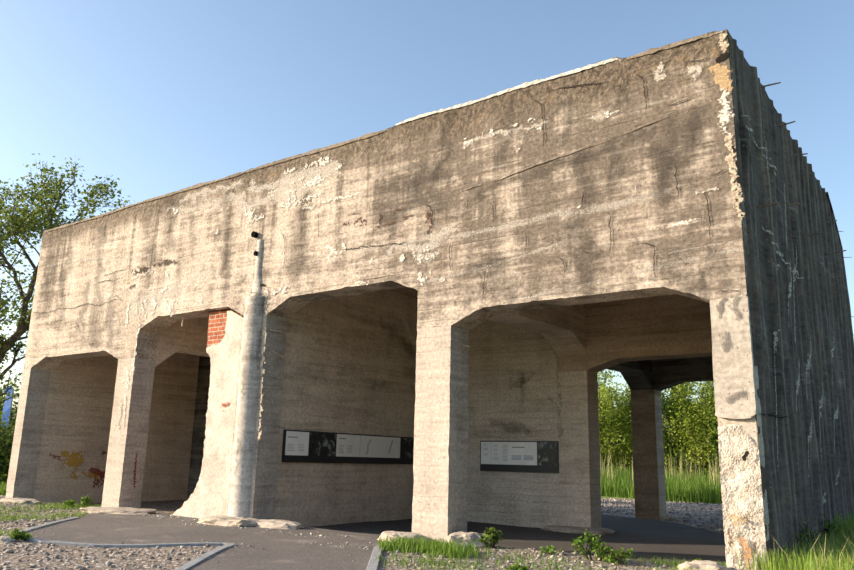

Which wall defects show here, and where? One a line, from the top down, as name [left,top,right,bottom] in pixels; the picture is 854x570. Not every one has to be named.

spalling [45,128,392,232]
water stain [166,157,361,231]
spalling [627,31,745,220]
spalling [718,424,767,570]